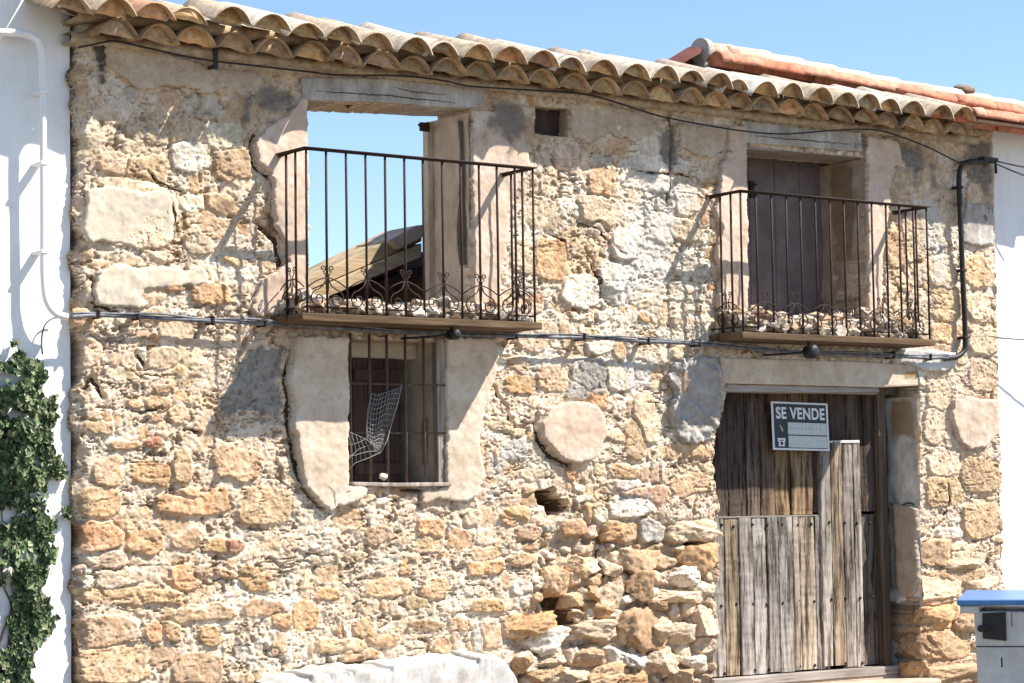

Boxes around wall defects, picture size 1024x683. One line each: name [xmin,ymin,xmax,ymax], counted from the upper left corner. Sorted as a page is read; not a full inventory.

crack [248,135,268,179]
crack [254,223,281,267]
crack [282,362,348,508]
spalling [534,486,567,517]